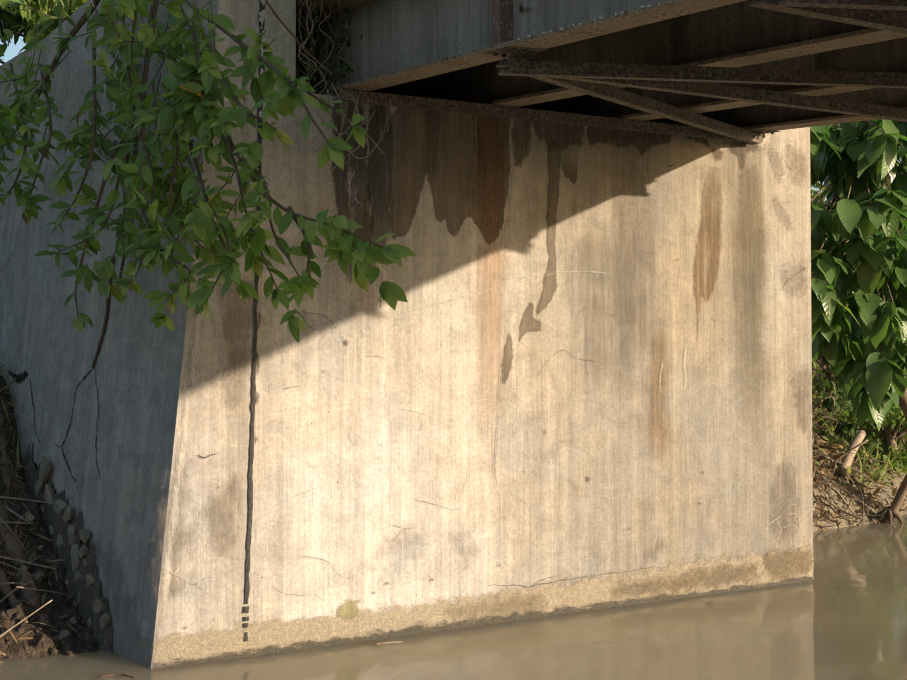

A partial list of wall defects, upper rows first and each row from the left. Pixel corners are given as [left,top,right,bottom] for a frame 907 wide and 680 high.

leakage [331,102,673,383]
rust [694,191,722,315]
crack [30,349,102,495]
leakage [96,520,815,670]